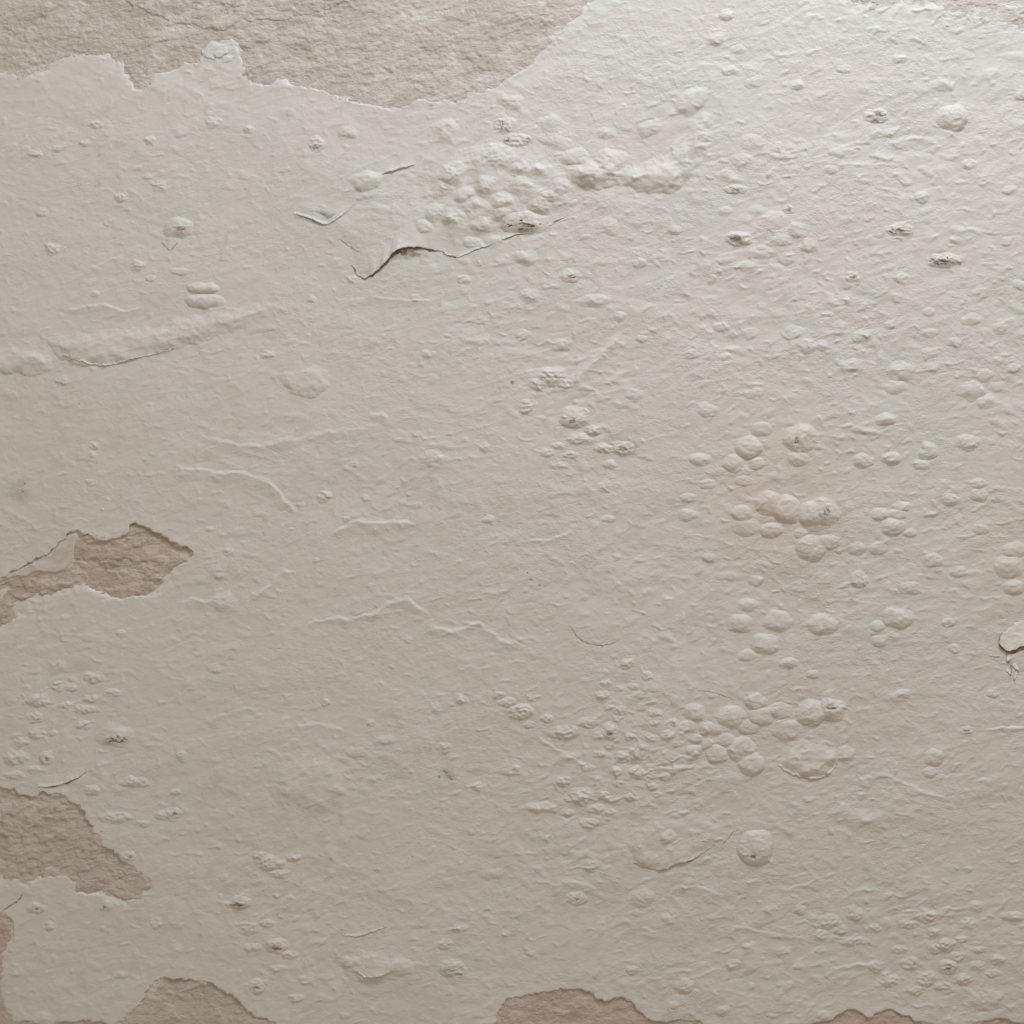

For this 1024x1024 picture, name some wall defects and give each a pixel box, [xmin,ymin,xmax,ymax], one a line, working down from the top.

peeling [0,0,594,118]
peeling [0,514,197,626]
peeling [989,620,1024,680]
peeling [0,761,157,901]
peeling [0,910,37,1024]
peeling [55,970,280,1024]
peeling [492,981,702,1024]